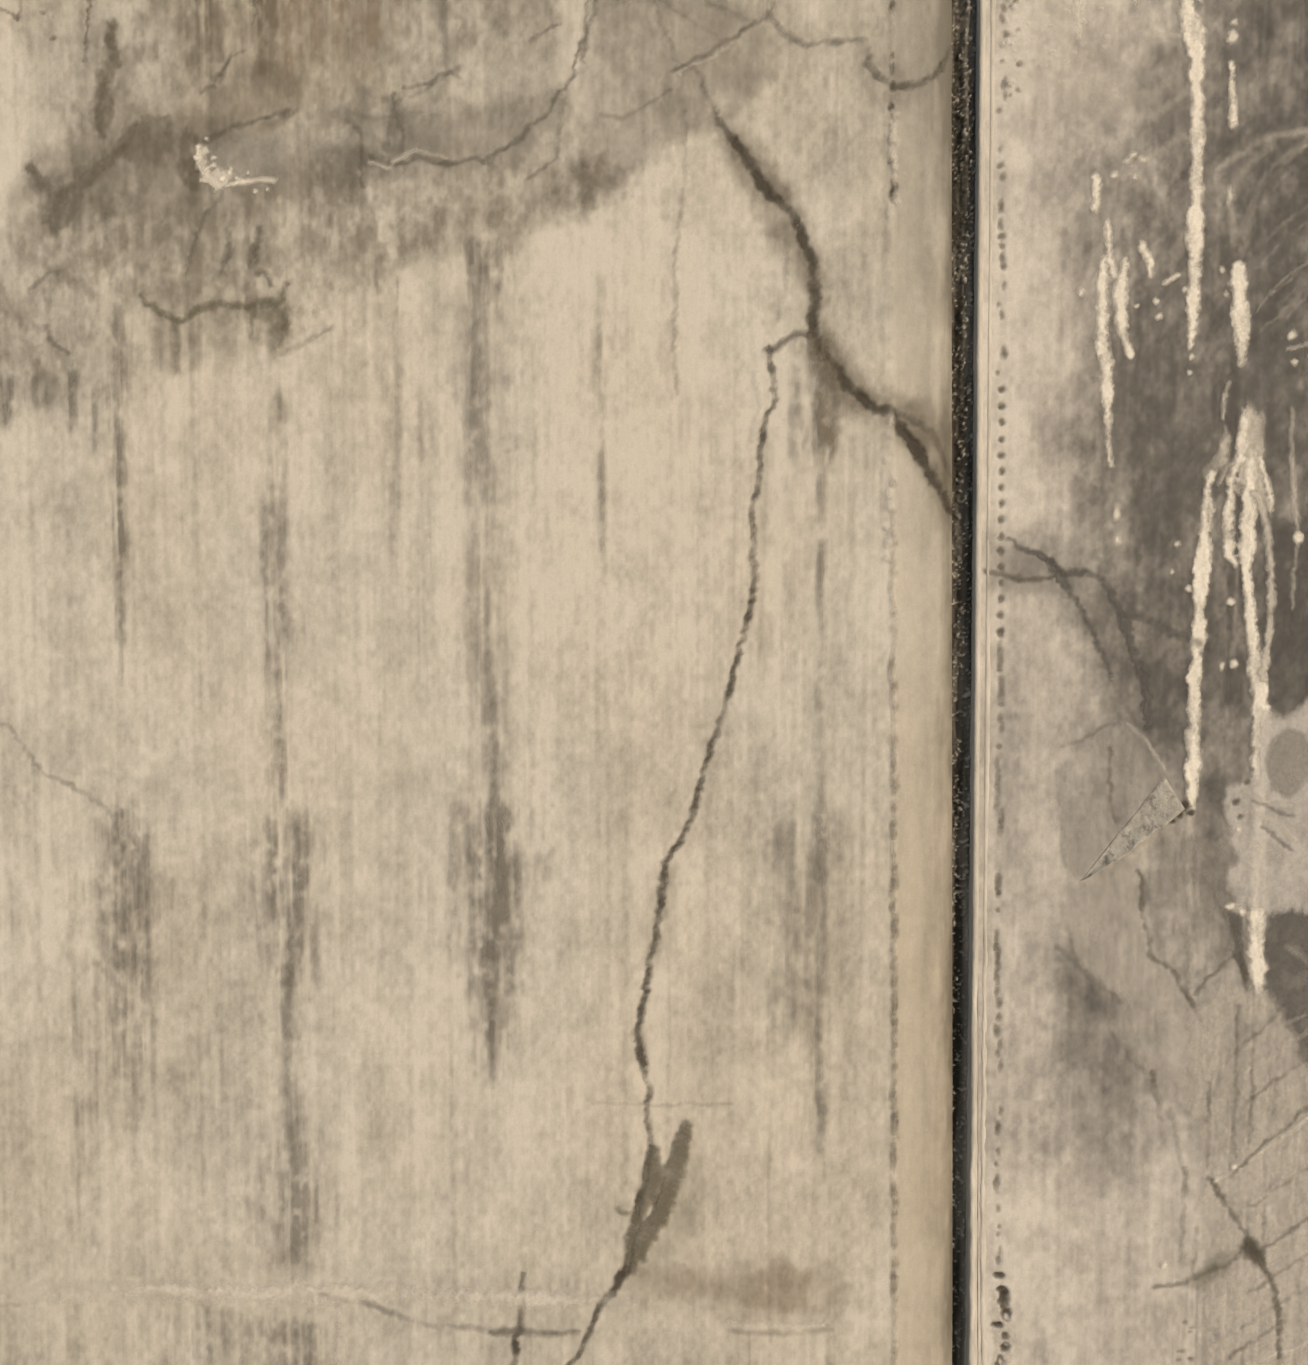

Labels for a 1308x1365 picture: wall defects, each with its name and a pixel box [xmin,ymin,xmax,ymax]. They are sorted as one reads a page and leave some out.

spalling [194,138,275,193]
crack [738,23,947,88]
water stain [1079,0,1206,466]
water stain [1229,61,1237,127]
water stain [1221,261,1250,364]
crack [636,123,952,1209]
crack [1011,542,1177,729]
water stain [1184,408,1308,817]
peeling [1081,776,1194,881]
water stain [468,786,522,1058]
water stain [620,1121,692,1274]
crack [512,1266,628,1365]